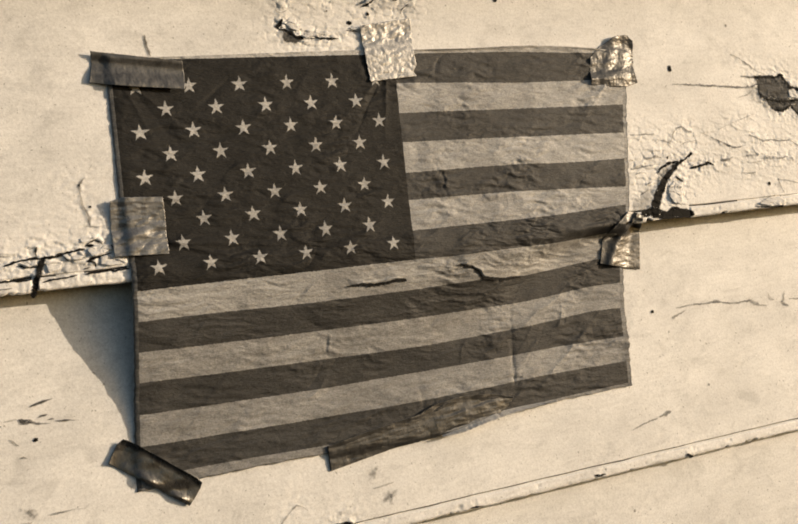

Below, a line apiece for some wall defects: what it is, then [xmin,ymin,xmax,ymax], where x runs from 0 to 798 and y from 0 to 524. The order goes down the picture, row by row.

spalling [754,74,798,115]
crack [635,126,796,219]
crack [0,247,130,298]